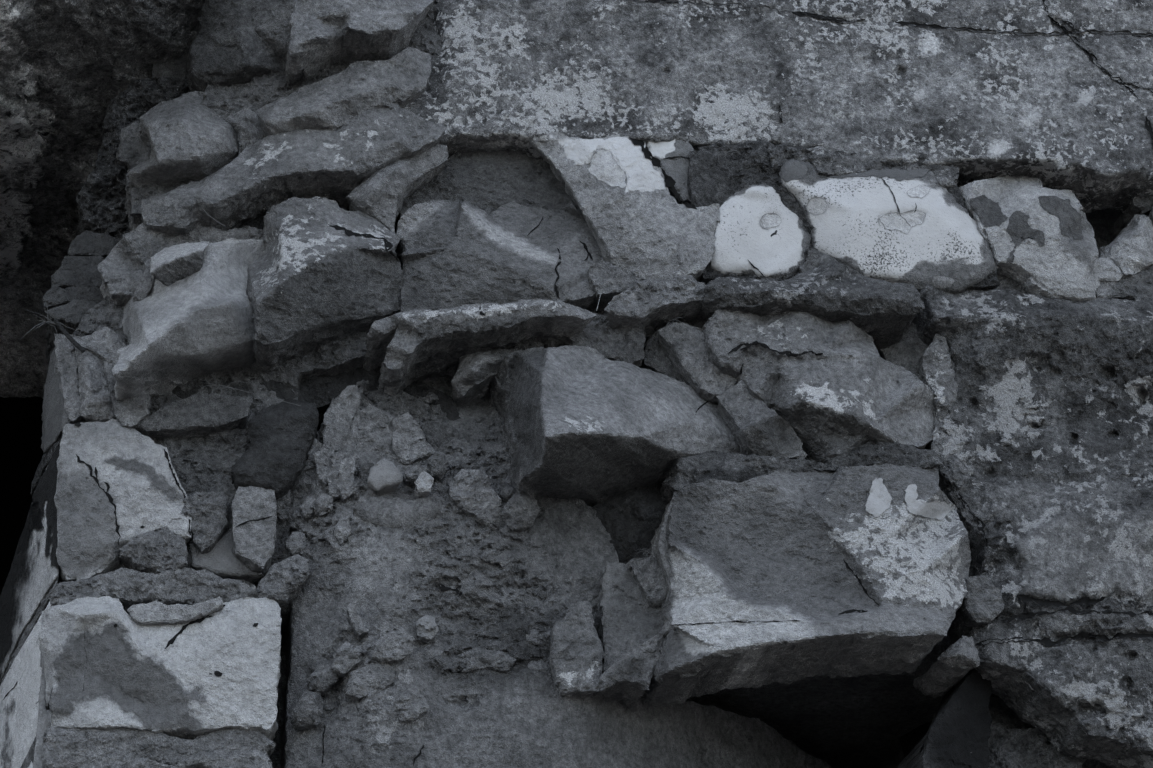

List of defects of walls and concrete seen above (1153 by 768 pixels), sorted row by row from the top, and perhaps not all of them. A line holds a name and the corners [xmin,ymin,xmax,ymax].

crack [635,0,866,22]
crack [895,0,1153,147]
peeling [588,150,627,188]
crack [629,137,697,209]
peeling [818,168,929,181]
peeling [877,209,926,234]
spalling [149,241,209,294]
peeling [303,385,361,501]
crack [76,454,121,545]
spalling [641,463,971,708]